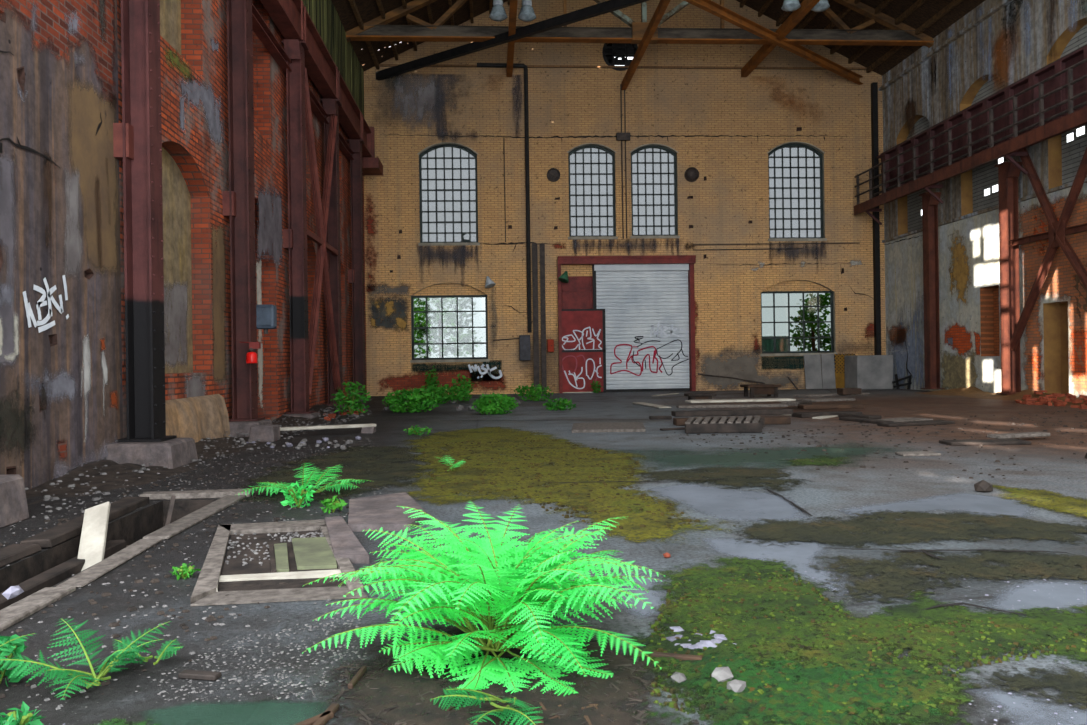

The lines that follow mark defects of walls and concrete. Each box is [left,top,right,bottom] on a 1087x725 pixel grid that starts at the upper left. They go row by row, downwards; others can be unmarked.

flaking render [0,0,117,107]
peeling [180,78,224,143]
water stain [395,75,458,139]
peeling [0,155,19,365]
peeling [256,188,282,304]
water stain [419,245,477,266]
water stain [573,239,679,254]
water stain [770,244,826,258]
flaking render [940,323,980,390]